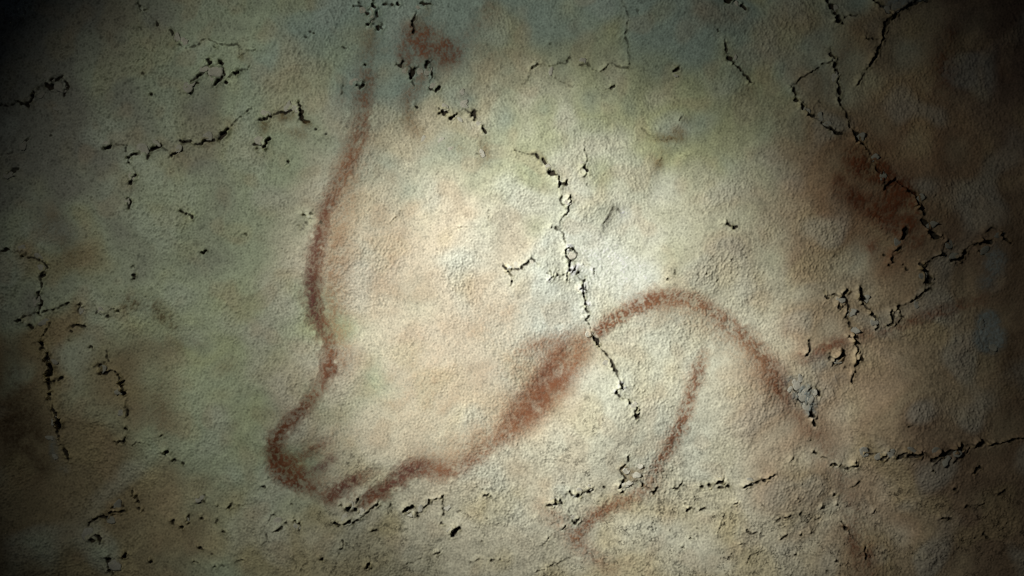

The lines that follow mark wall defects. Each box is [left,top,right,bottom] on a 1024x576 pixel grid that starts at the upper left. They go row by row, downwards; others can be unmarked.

crack [0,71,70,111]
crack [397,60,487,134]
crack [102,100,327,209]
crack [792,0,1012,383]
crack [502,258,535,283]
crack [519,151,640,419]
crack [1,245,129,460]
crack [547,457,774,527]
crack [792,379,1024,520]